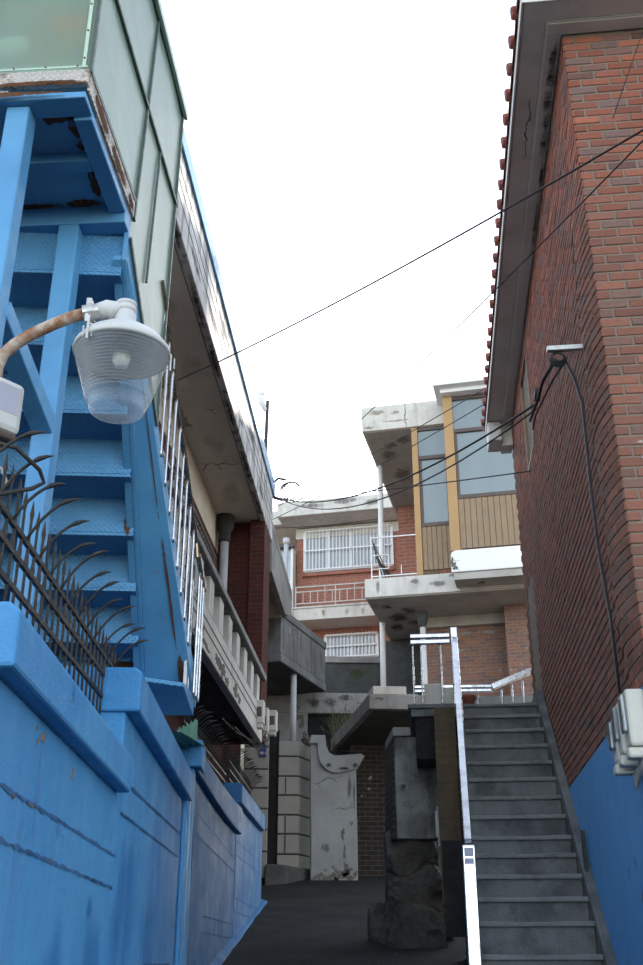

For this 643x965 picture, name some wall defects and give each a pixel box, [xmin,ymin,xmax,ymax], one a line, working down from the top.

rust [0,79,87,97]
rust [96,95,134,210]
crack [523,100,531,159]
water stain [541,46,557,149]